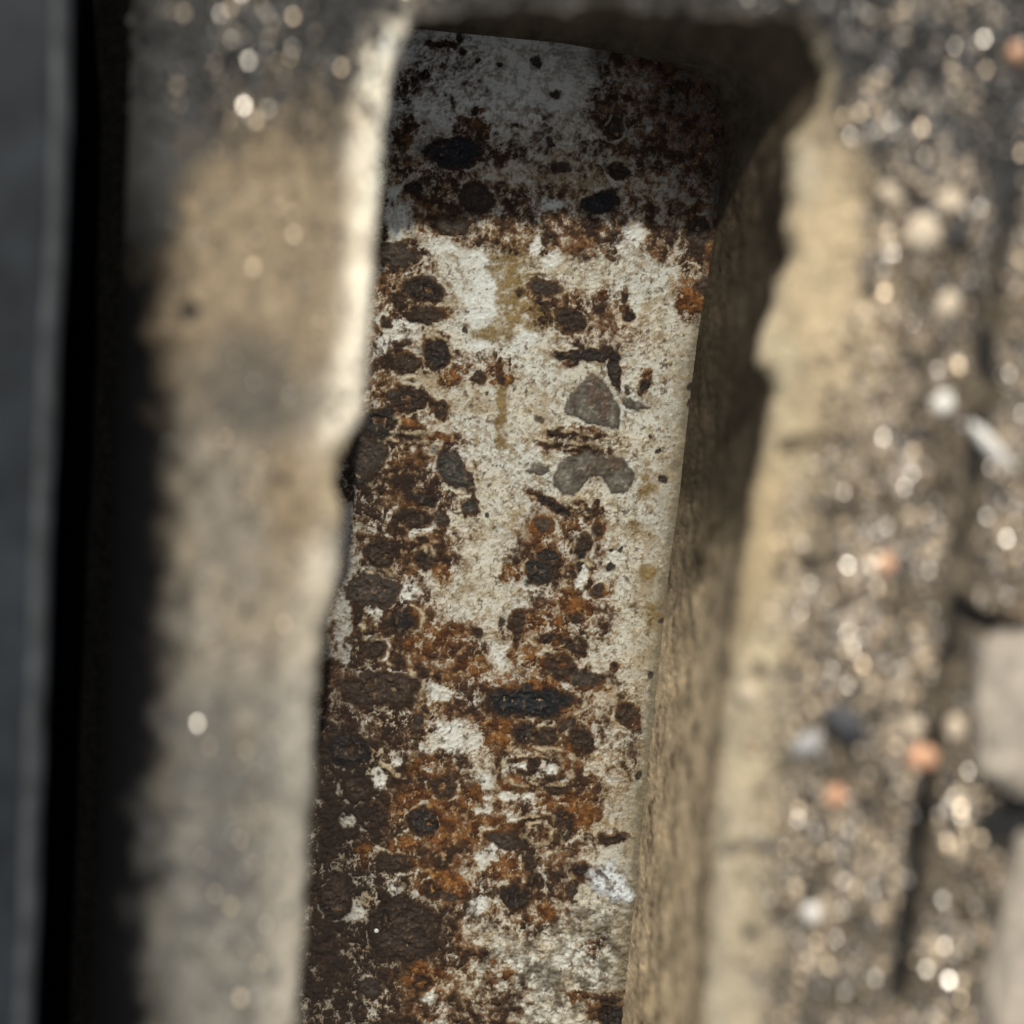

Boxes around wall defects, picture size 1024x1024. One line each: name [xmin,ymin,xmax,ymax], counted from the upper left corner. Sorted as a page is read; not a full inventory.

rust [296,37,725,1024]